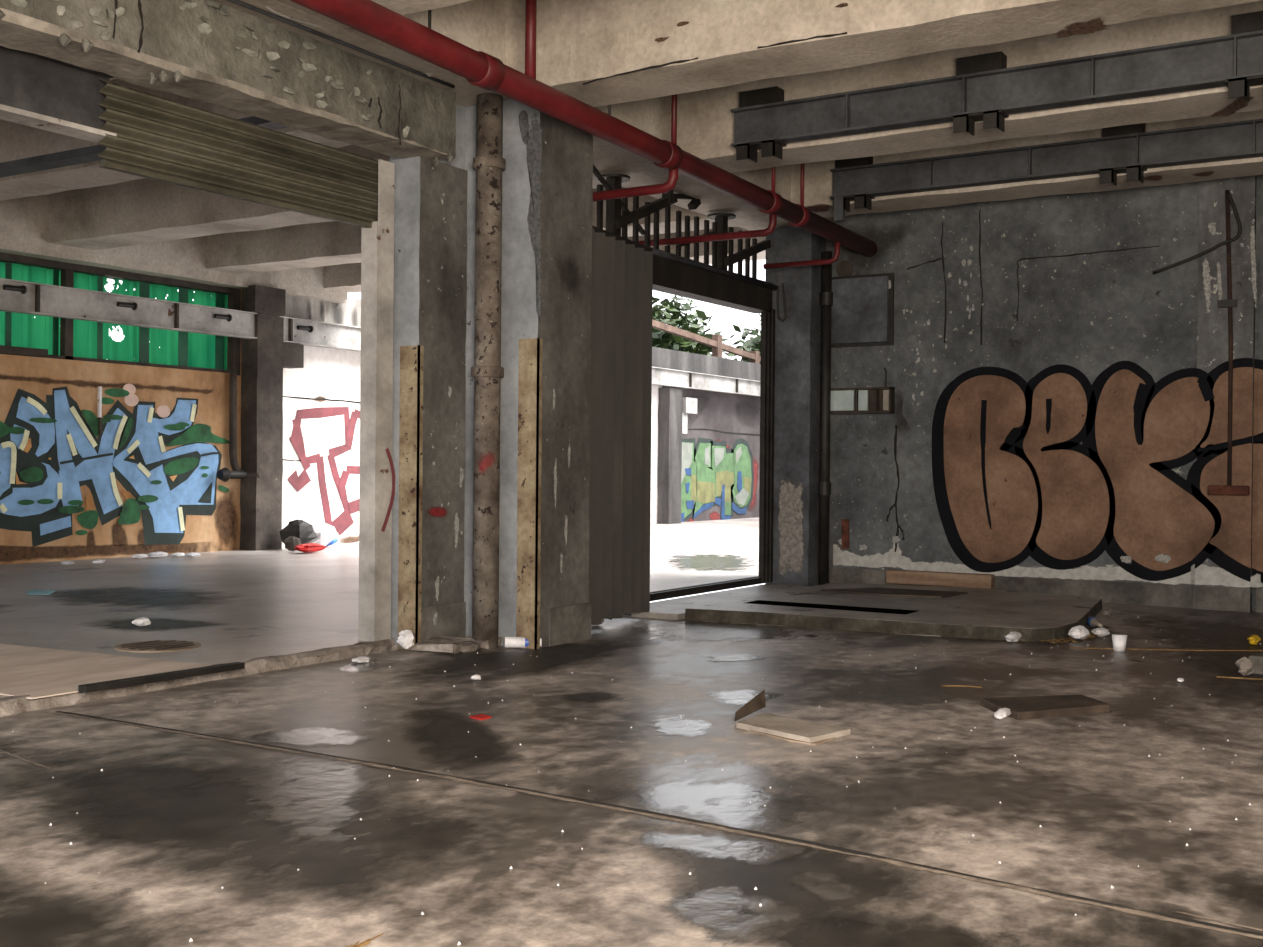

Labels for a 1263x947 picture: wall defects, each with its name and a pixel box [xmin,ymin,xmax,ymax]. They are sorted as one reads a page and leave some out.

peeling [0,0,28,19]
peeling [54,0,124,53]
crack [112,0,144,53]
peeling [180,0,230,34]
spalling [150,70,184,85]
peeling [234,23,378,120]
crack [886,425,905,552]
peeling [778,479,805,575]
peeling [833,536,1263,588]
water stain [56,588,218,631]
water stain [409,712,511,763]
water stain [0,870,164,947]